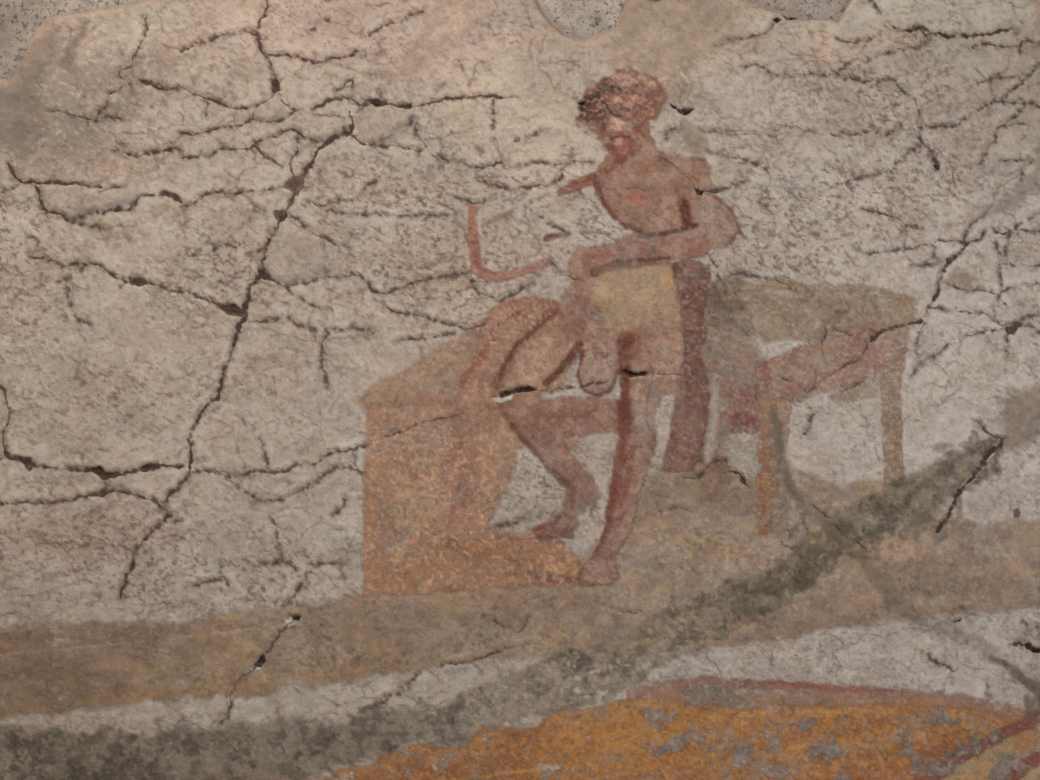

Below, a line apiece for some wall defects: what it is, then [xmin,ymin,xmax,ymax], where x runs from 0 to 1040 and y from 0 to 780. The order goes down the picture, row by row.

crack [744,0,1040,177]
crack [659,129,770,192]
crack [0,3,590,598]
crack [782,208,1040,392]
crack [936,421,1005,533]
crack [218,527,338,724]
crack [1014,623,1040,652]
peeling [529,760,563,780]
peeling [635,706,709,757]
peeling [719,724,791,780]
peeling [806,735,849,764]
peeling [896,706,1022,780]